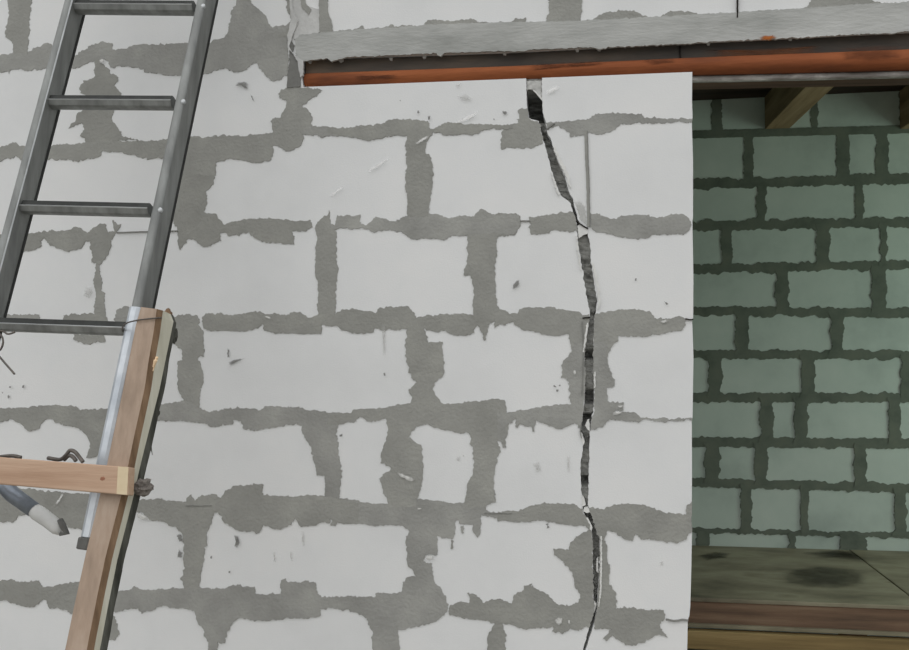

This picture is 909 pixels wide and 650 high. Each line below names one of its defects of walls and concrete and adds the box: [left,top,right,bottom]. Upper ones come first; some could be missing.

crack [526,79,603,650]